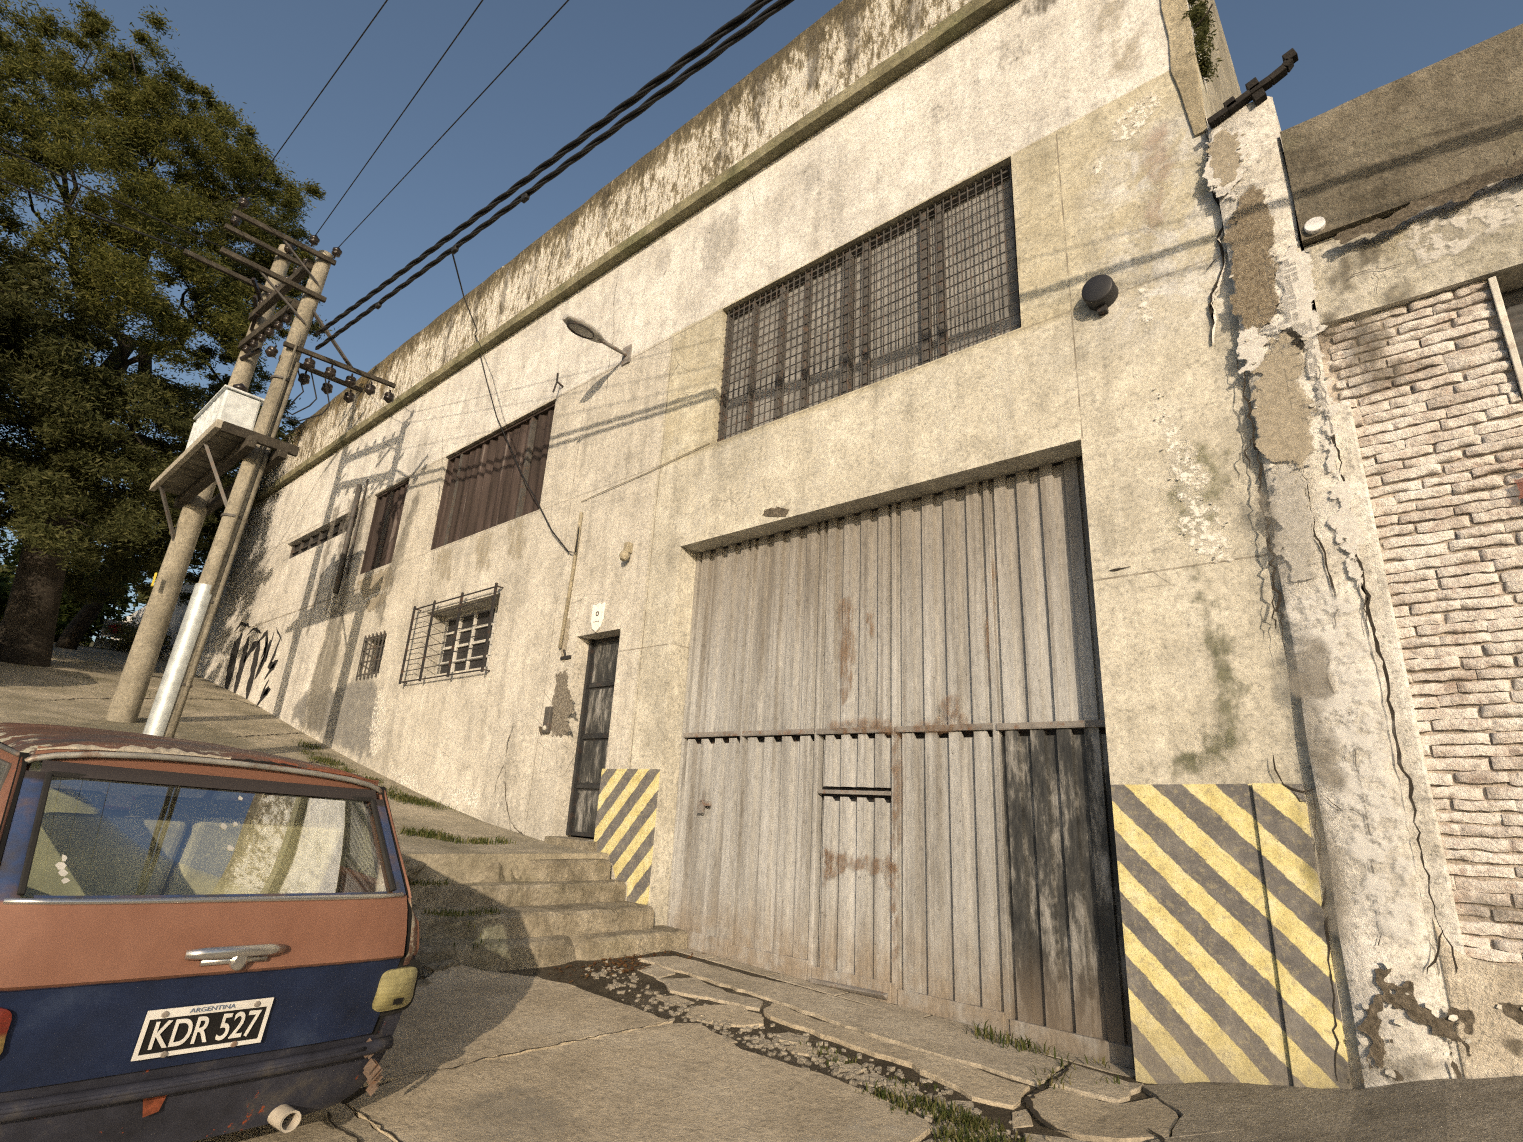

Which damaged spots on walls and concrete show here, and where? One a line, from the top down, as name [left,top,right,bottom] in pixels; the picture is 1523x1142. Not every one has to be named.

leakage [807,29,821,87]
leakage [845,3,859,61]
peeling [1334,157,1523,263]
peeling [1202,127,1322,582]
crack [1205,117,1458,1081]
corrosion [839,600,874,701]
leakage [1176,637,1235,772]
spalling [1357,962,1475,1083]
spalling [1496,1003,1523,1054]
crack [324,1101,402,1142]
crack [1018,1060,1076,1133]